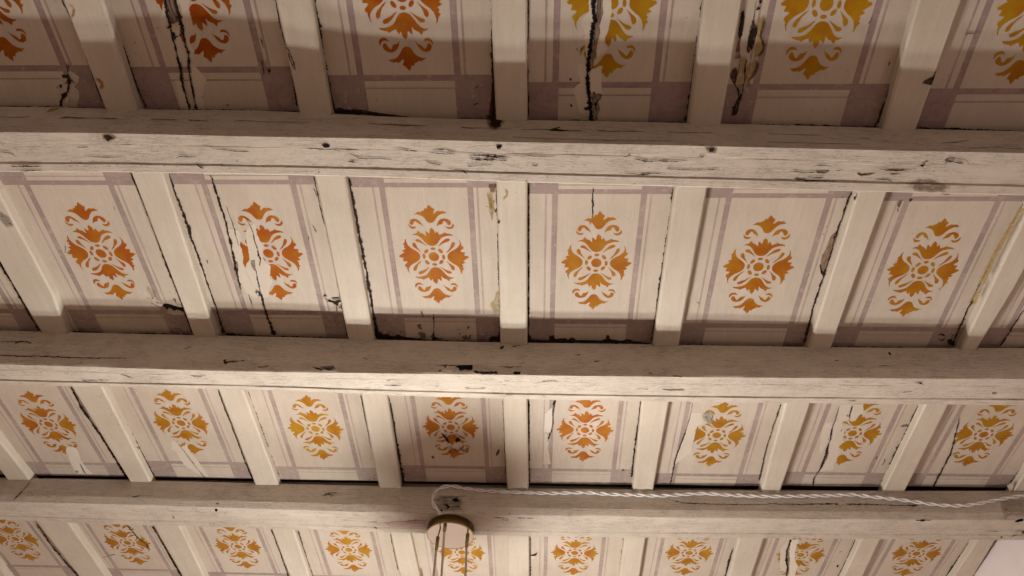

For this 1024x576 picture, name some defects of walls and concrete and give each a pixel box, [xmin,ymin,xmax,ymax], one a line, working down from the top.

crack [156,0,276,335]
crack [309,0,747,175]
crack [663,389,959,507]